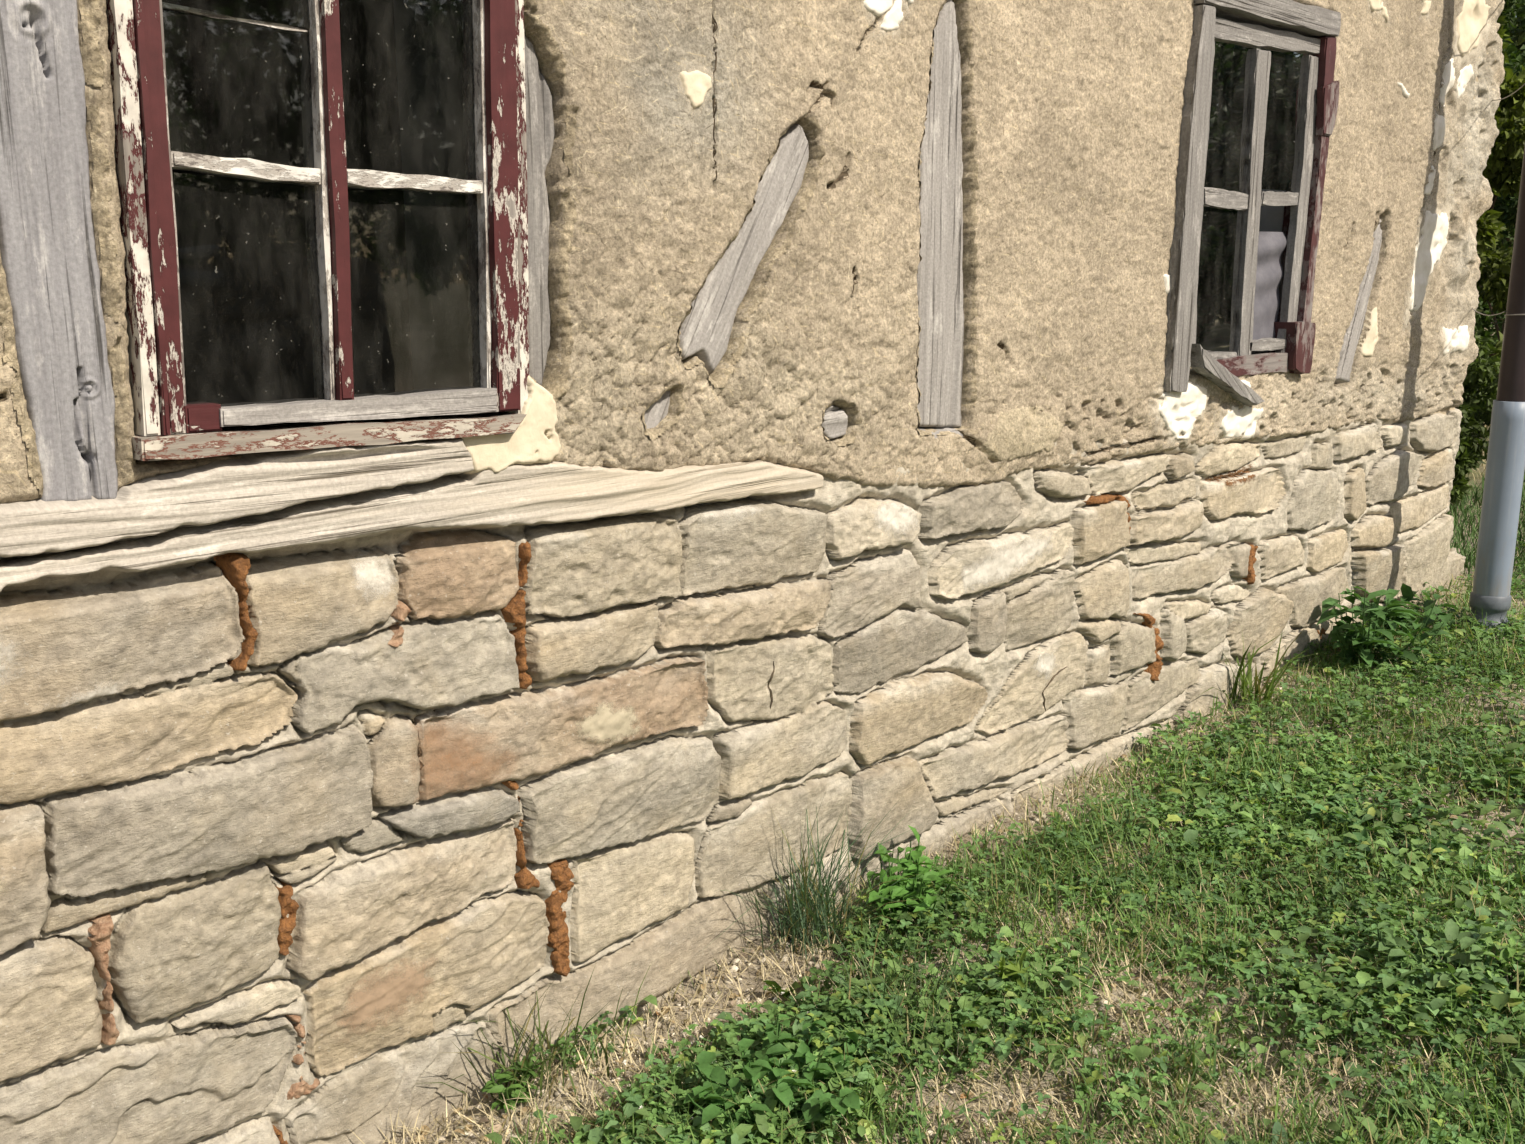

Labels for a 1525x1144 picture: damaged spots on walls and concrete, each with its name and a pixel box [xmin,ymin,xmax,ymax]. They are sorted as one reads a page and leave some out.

spalling [0,252,44,499]
spalling [78,0,135,488]
spalling [461,105,579,474]
spalling [524,0,567,83]
peeling [678,64,712,110]
crack [711,14,719,182]
peeling [863,0,914,37]
spalling [915,0,980,436]
peeling [1150,374,1265,450]
peeling [1403,0,1493,329]